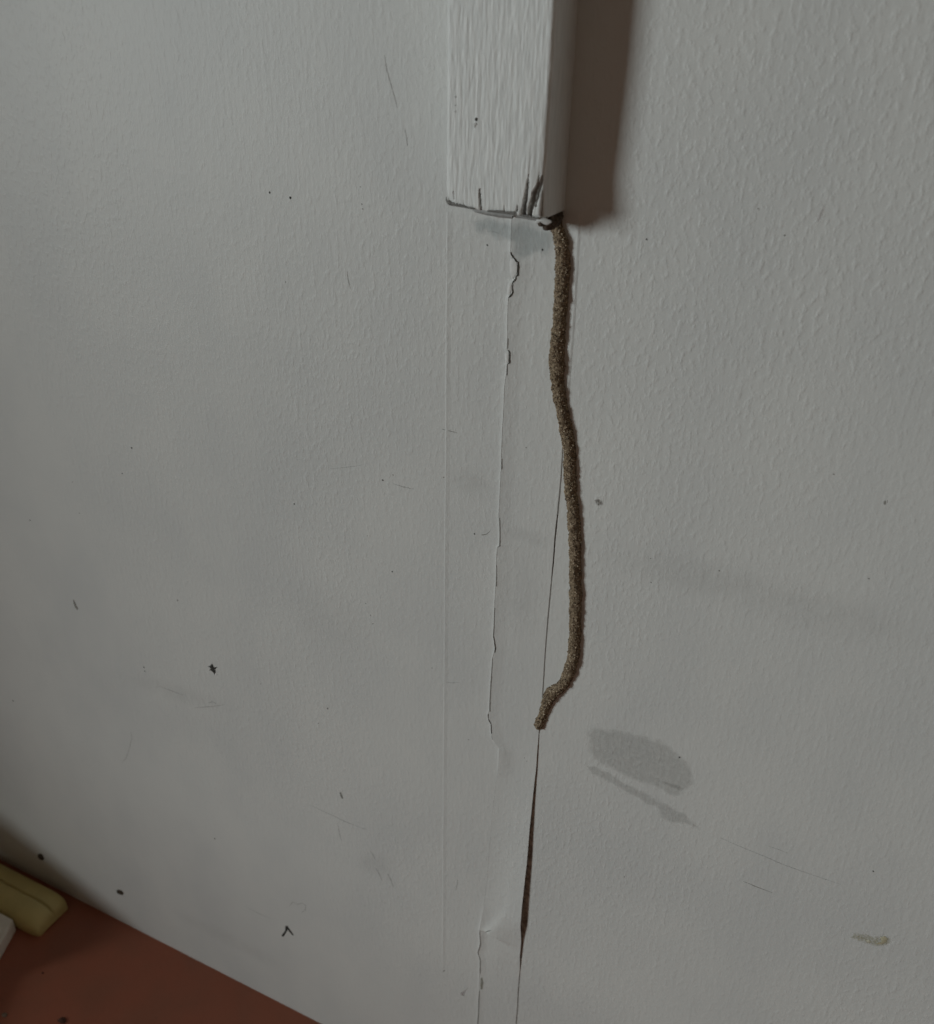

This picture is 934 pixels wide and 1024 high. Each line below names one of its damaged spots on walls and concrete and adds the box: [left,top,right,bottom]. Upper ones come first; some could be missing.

crack [564,210,581,397]
crack [465,216,519,1024]
crack [542,452,563,699]